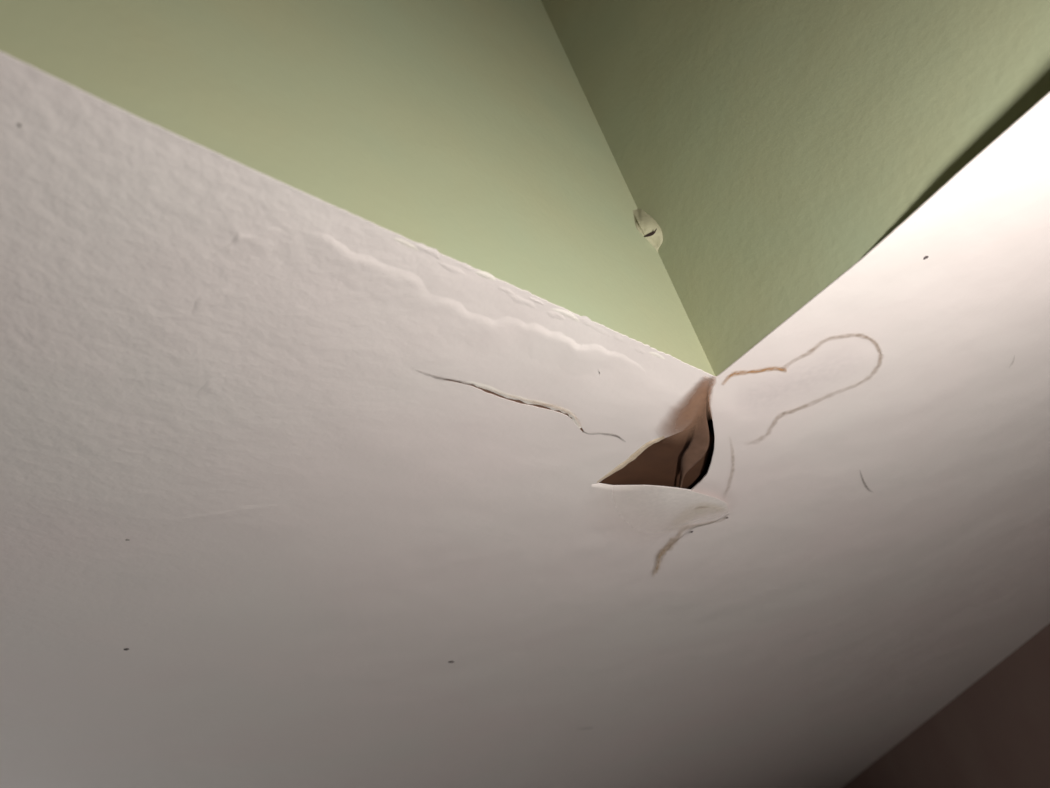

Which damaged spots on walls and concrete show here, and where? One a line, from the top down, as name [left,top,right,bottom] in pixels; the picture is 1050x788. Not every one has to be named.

crack [443,379,584,432]
peeling [586,401,730,571]